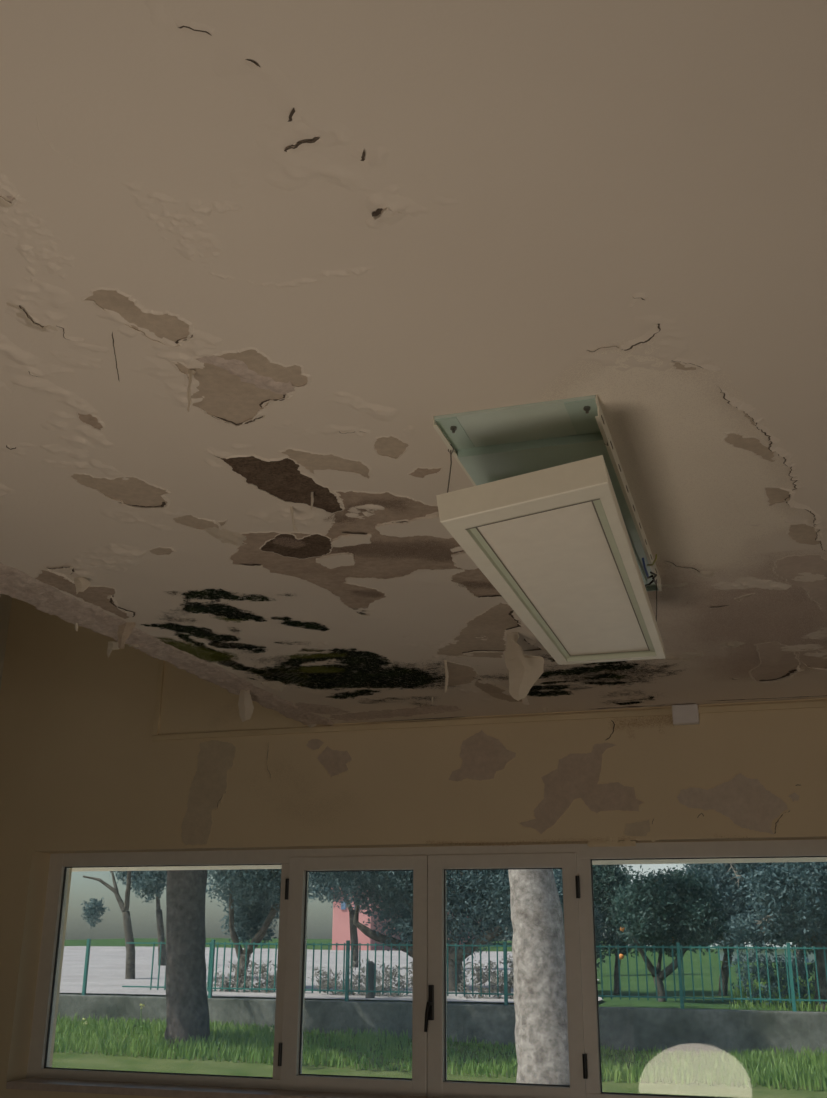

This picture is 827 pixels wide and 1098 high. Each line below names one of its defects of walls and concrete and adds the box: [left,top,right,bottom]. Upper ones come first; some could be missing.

peeling [75,410,106,431]
peeling [372,435,411,459]
peeling [69,473,222,531]
peeling [207,447,544,705]